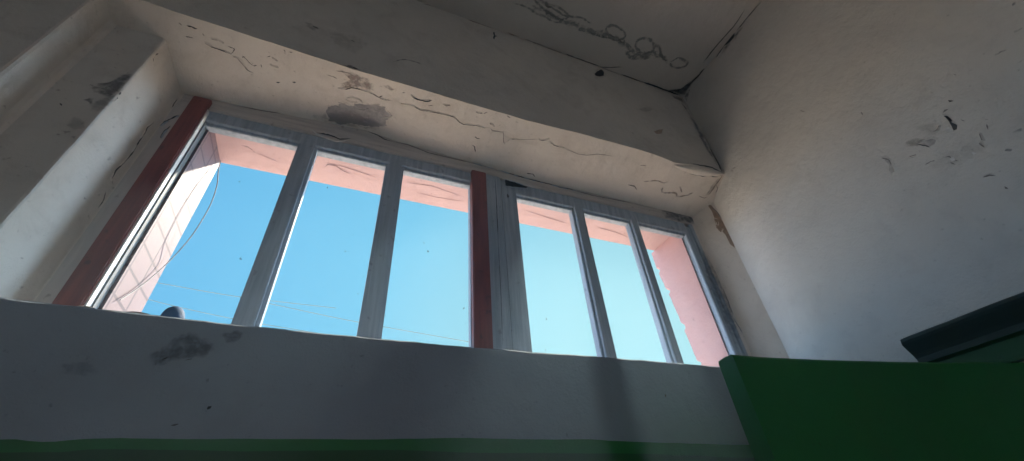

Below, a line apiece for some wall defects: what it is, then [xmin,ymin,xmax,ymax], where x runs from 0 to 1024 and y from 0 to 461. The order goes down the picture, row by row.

crack [98,100,179,208]
flaking render [312,74,393,142]
crack [328,71,630,345]
damp [521,0,688,69]
crack [470,2,761,171]
flaking render [699,167,736,248]